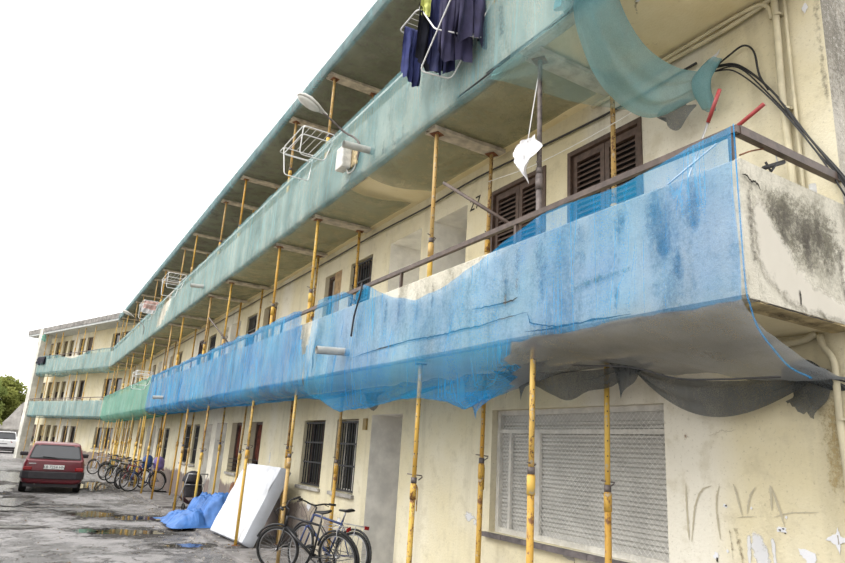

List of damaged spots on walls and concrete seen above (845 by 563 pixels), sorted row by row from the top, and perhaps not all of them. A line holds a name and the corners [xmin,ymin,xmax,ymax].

water stain [762,192,844,271]
peeling [826,527,845,553]
peeling [798,548,817,563]